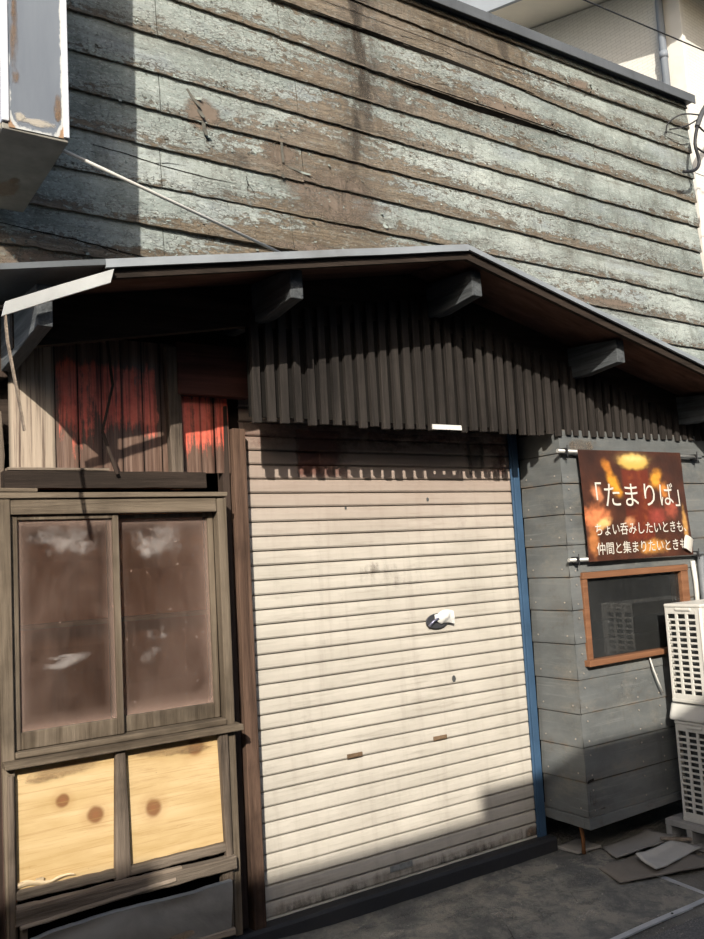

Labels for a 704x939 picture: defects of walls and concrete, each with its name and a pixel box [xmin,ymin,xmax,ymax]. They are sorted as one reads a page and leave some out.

peeling [185,88,220,138]
peeling [475,97,559,129]
peeling [265,136,388,252]
peeling [1,237,91,263]
rust [266,423,375,476]